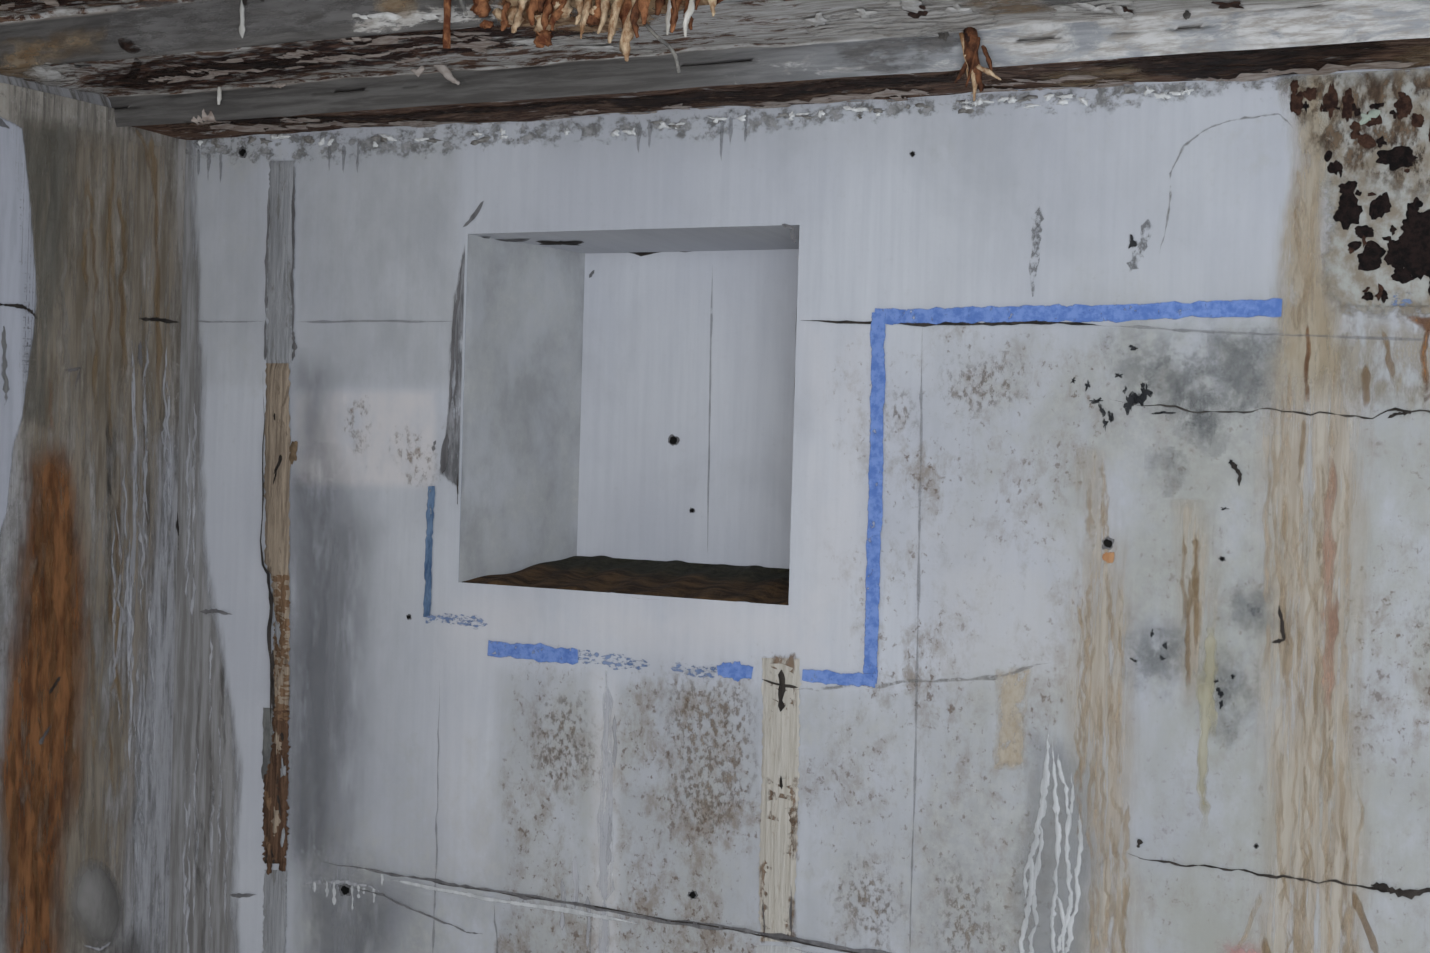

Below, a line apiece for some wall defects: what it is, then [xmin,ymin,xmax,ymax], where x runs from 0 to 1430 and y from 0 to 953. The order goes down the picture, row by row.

corrosion [74,21,596,90]
peeling [800,0,998,72]
spalling [186,98,934,163]
spalling [953,76,1298,114]
corrosion [166,38,1430,396]
damp [1071,373,1183,431]
crack [1111,399,1430,419]
damp [1230,84,1378,953]
corrosion [1,455,83,953]
damp [1018,732,1084,953]
crack [1130,839,1430,900]
crack [333,864,890,953]